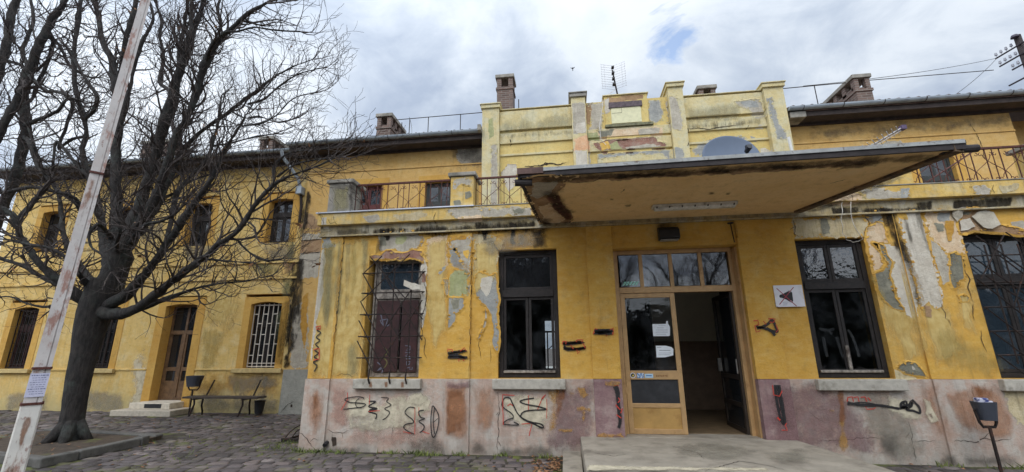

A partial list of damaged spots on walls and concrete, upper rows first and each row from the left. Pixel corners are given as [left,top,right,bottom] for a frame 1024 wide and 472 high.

water stain [258,192,311,367]
peeling [290,95,876,378]
water stain [544,155,932,219]
peeling [791,183,1024,380]